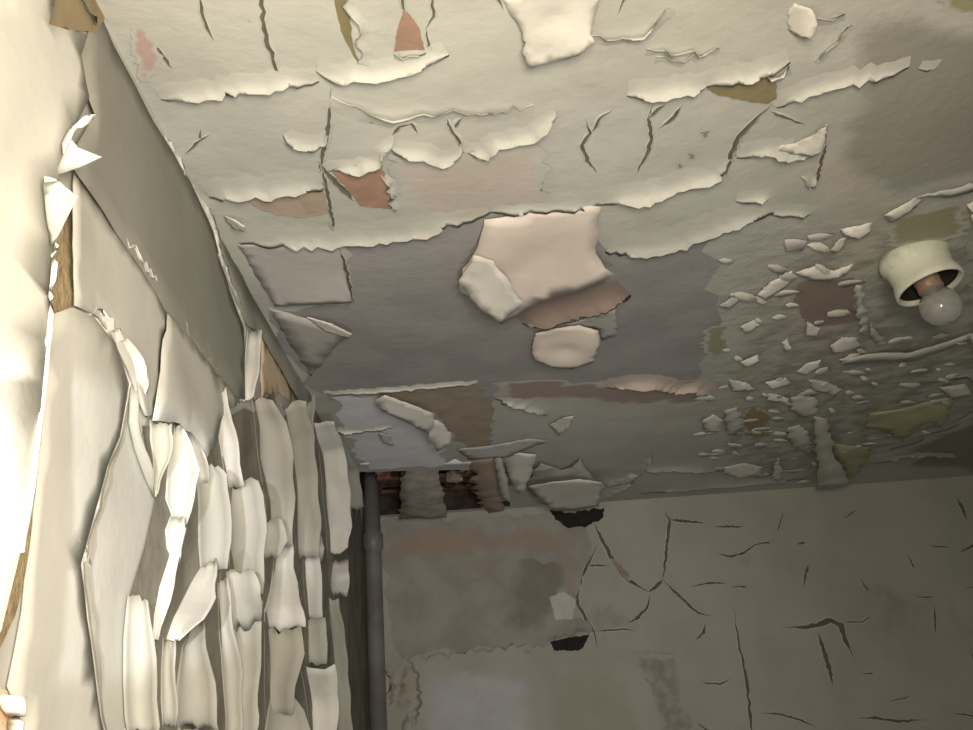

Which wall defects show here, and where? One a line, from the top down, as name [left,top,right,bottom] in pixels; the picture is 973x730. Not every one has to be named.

peeling [152,0,449,104]
peeling [503,0,676,68]
spalling [627,0,973,266]
peeling [0,0,129,730]
peeling [49,0,288,730]
spalling [220,157,973,730]
crack [907,543,973,569]
crack [956,497,967,521]
crack [575,511,815,730]
crack [781,615,873,687]
crack [916,596,937,635]
crack [858,696,973,724]